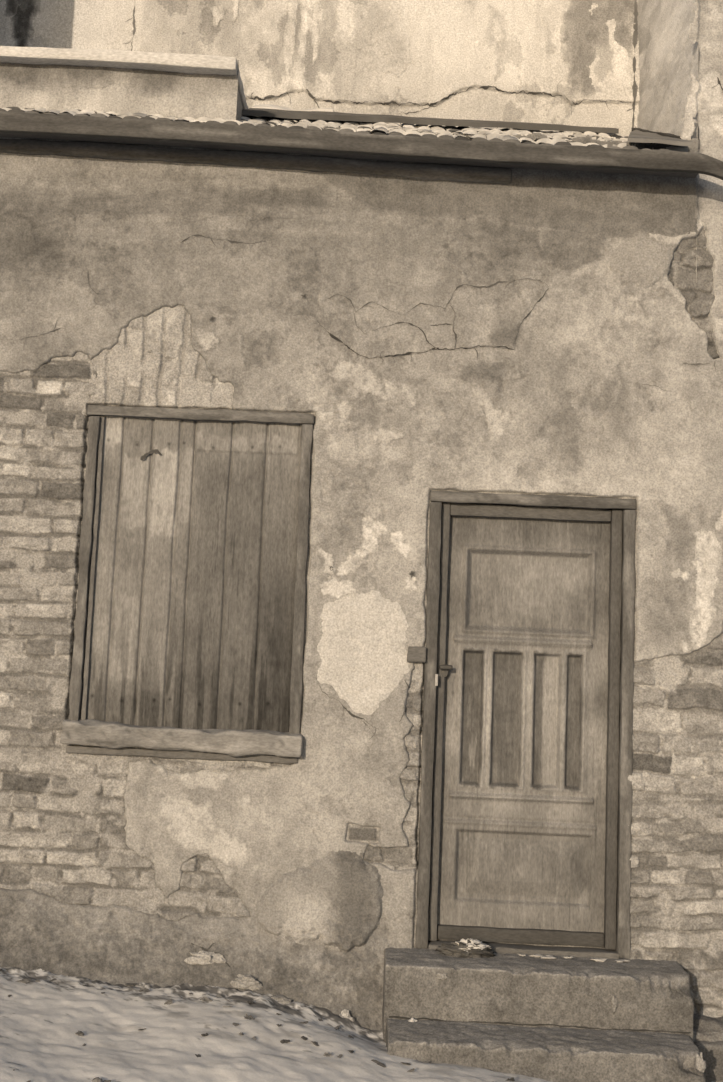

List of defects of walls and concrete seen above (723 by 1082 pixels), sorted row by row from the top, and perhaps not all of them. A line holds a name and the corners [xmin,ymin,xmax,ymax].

water stain [3,0,41,47]
crack [125,6,136,51]
water stain [352,0,416,78]
crack [247,0,638,128]
water stain [461,0,509,52]
water stain [536,0,638,101]
spalling [680,70,723,140]
crack [317,279,549,363]
spalling [648,214,723,359]
flaking render [0,305,293,921]
flaking render [346,662,424,870]
flaking render [625,508,723,1018]